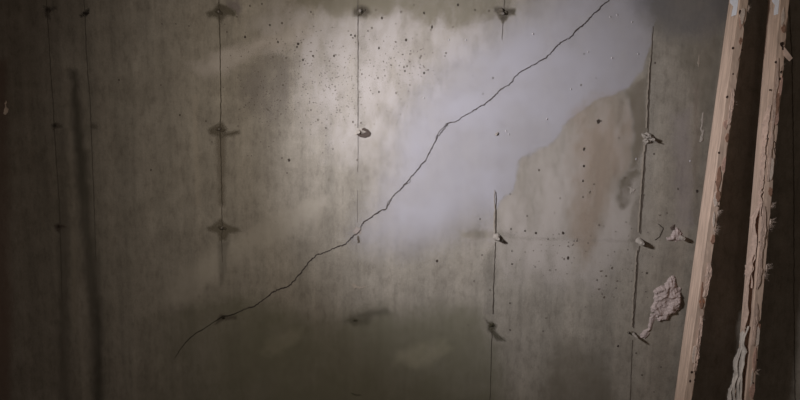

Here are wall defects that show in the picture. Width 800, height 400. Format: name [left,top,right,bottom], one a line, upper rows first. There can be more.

crack [175,0,609,357]
water stain [184,0,729,319]